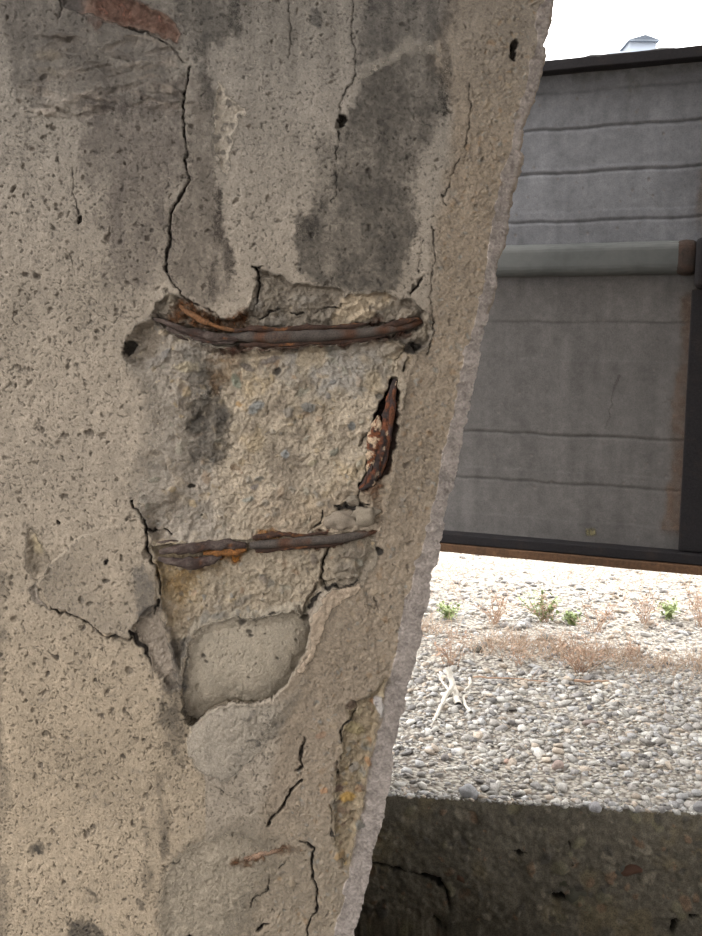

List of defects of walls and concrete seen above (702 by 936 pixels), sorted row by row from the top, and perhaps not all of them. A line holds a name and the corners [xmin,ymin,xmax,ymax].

crack [128,28,219,317]
leakage [295,0,451,291]
leakage [204,190,235,296]
crack [411,226,436,294]
corrosion [169,300,249,333]
corrosion [219,330,411,356]
spalling [123,269,434,724]
crack [131,500,173,614]
crack [51,608,152,665]
crack [268,741,305,825]
crack [251,863,285,931]
crack [300,808,334,933]